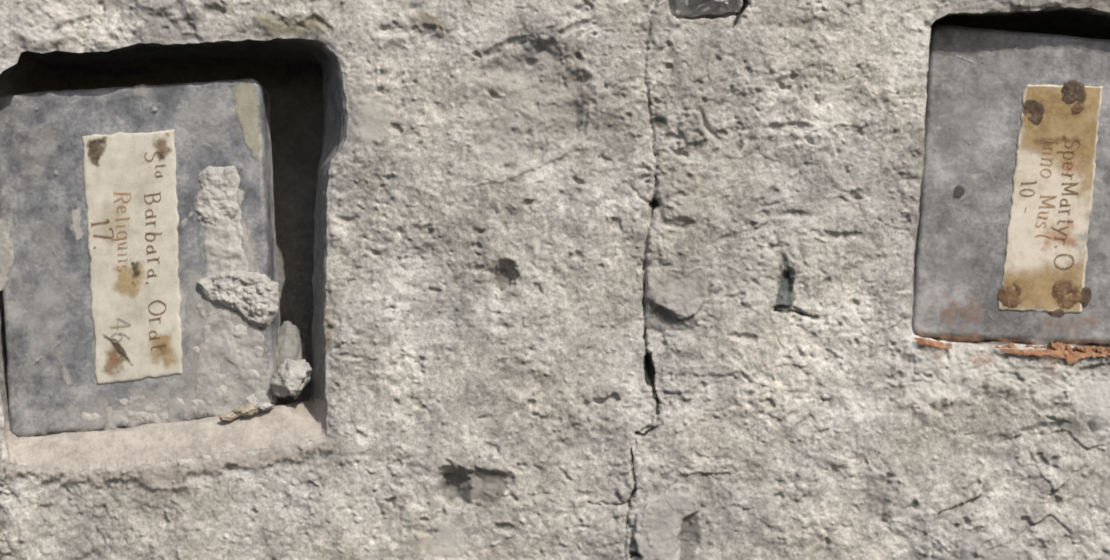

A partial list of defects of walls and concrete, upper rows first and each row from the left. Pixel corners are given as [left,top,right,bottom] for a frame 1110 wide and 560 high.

crack [641,267,649,354]
corrosion [914,337,952,349]
corrosion [995,341,1110,364]
crack [596,382,660,559]